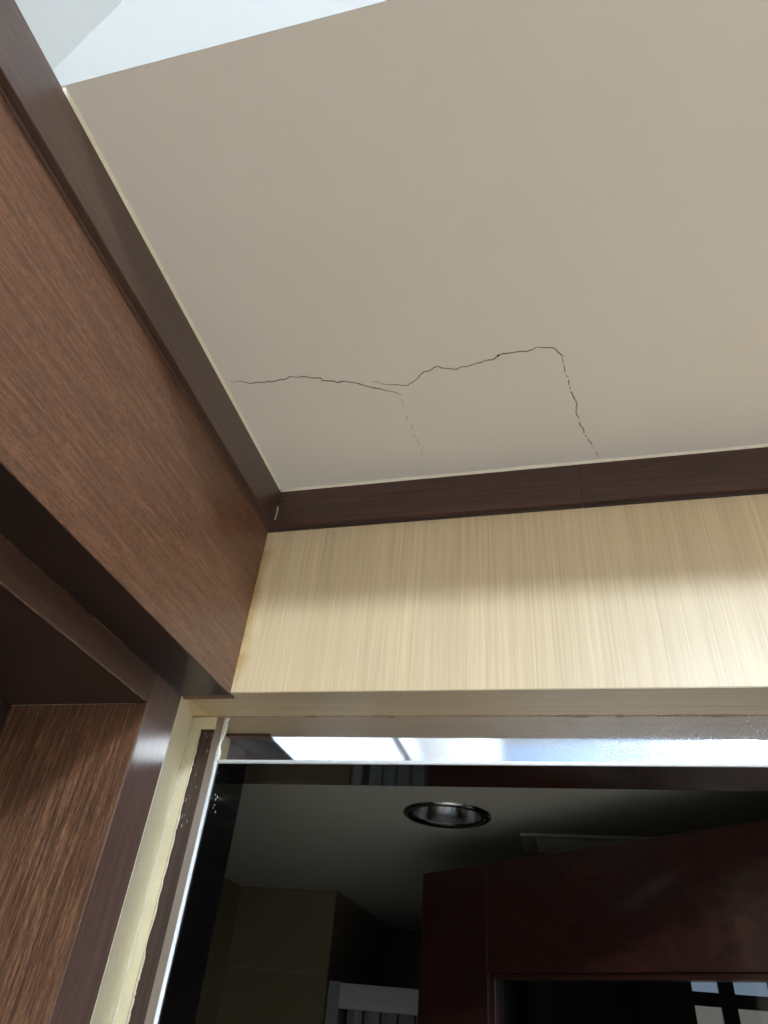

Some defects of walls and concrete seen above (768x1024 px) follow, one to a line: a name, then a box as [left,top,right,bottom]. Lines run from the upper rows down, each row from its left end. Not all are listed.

crack [225,347,598,455]